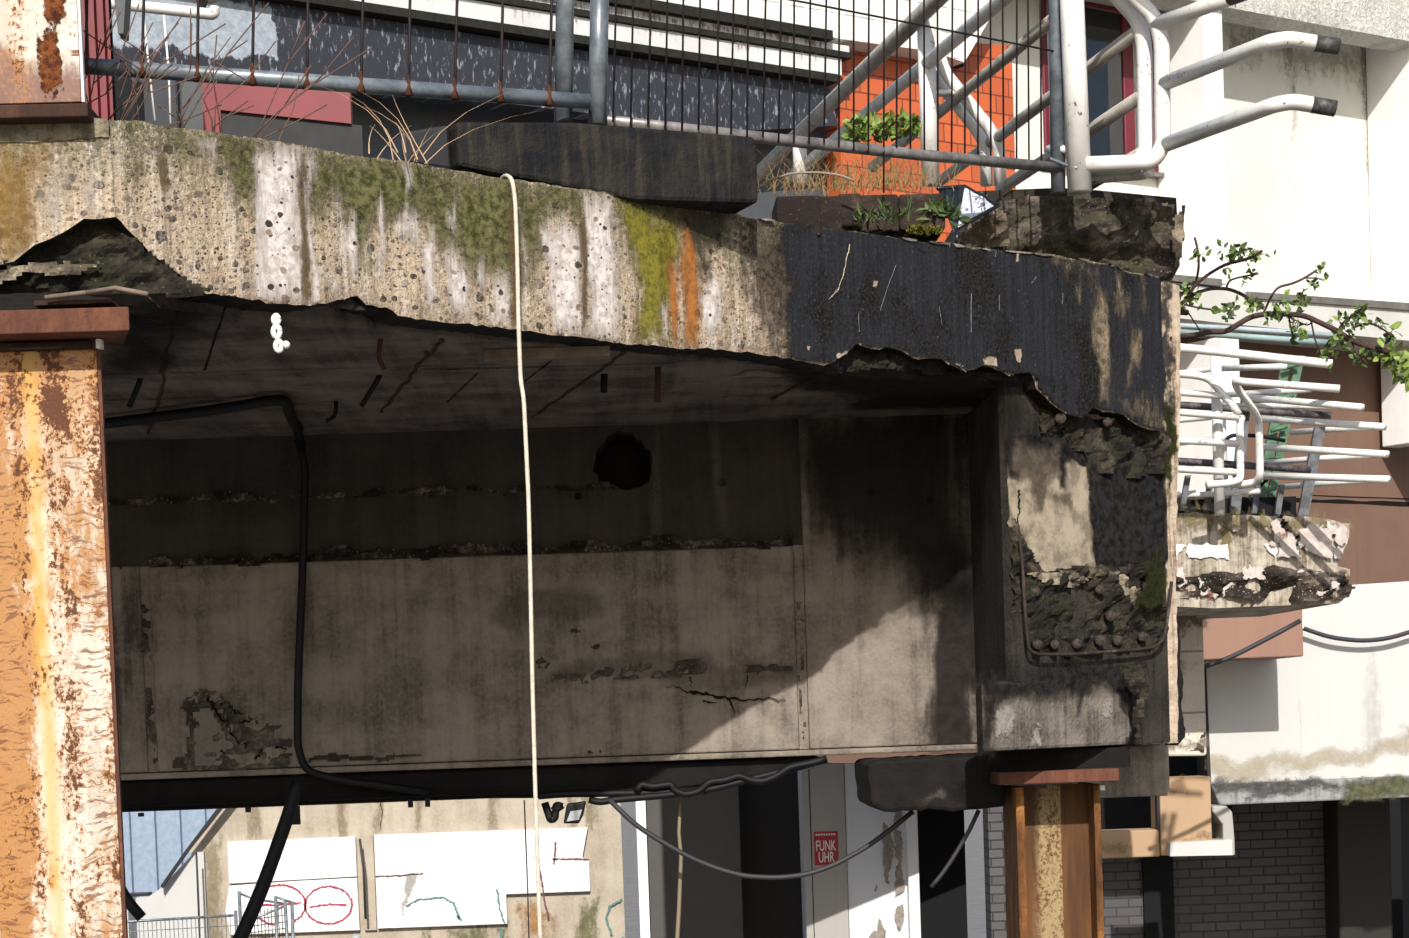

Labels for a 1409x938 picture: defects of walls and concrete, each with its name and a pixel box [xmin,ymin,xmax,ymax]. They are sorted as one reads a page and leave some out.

rust [36,0,66,98]
spalling [0,223,210,298]
leakage [253,144,336,301]
leakage [376,182,523,324]
leakage [541,193,793,354]
rust [667,223,702,347]
spalling [827,348,1004,378]
spalling [899,237,1170,478]
spalling [1009,518,1356,656]
spalling [138,604,421,771]
crack [667,675,785,714]
leakage [1168,738,1409,800]